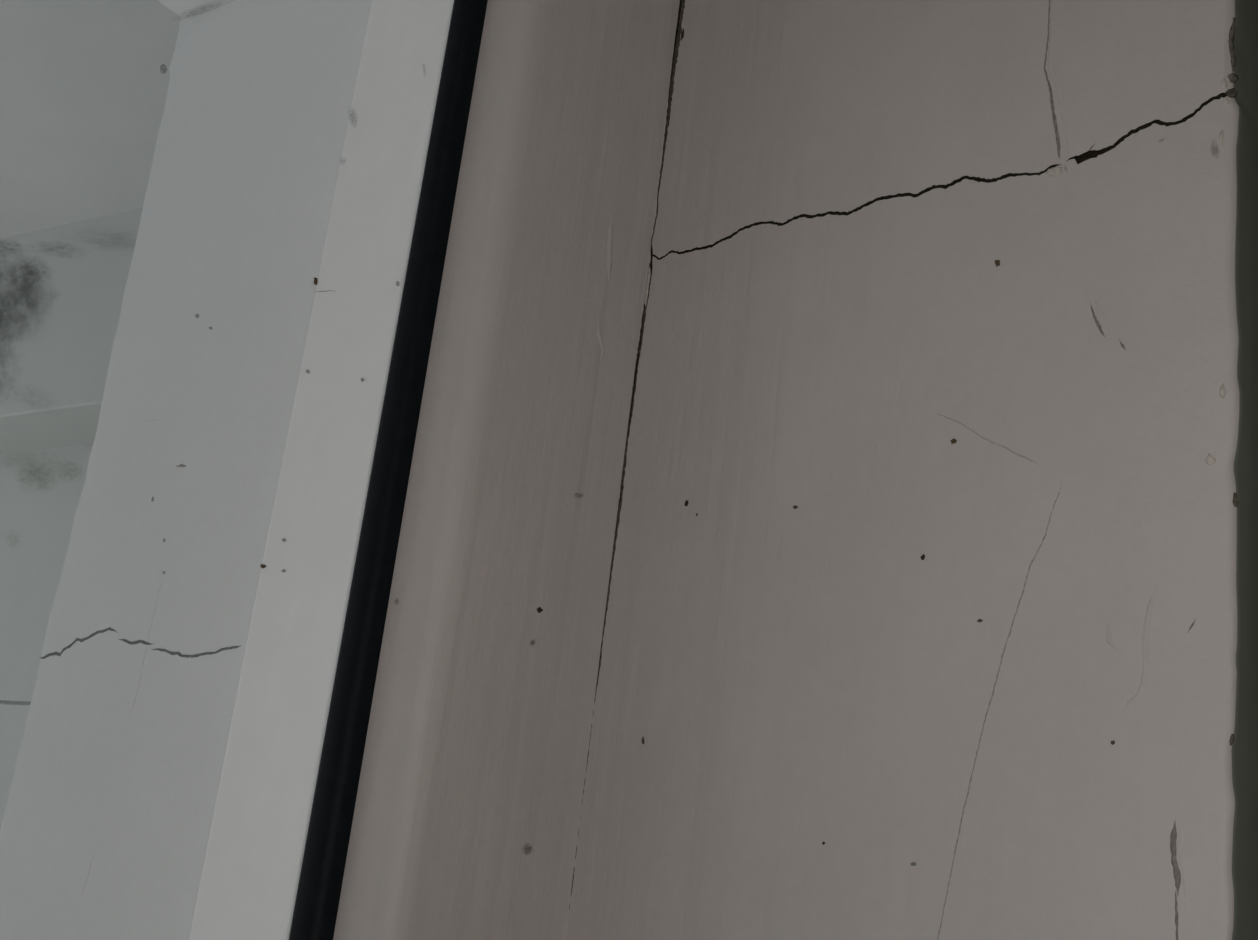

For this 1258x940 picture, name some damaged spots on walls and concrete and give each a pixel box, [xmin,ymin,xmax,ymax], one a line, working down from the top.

crack [40,627,240,659]
crack [569,0,1238,940]